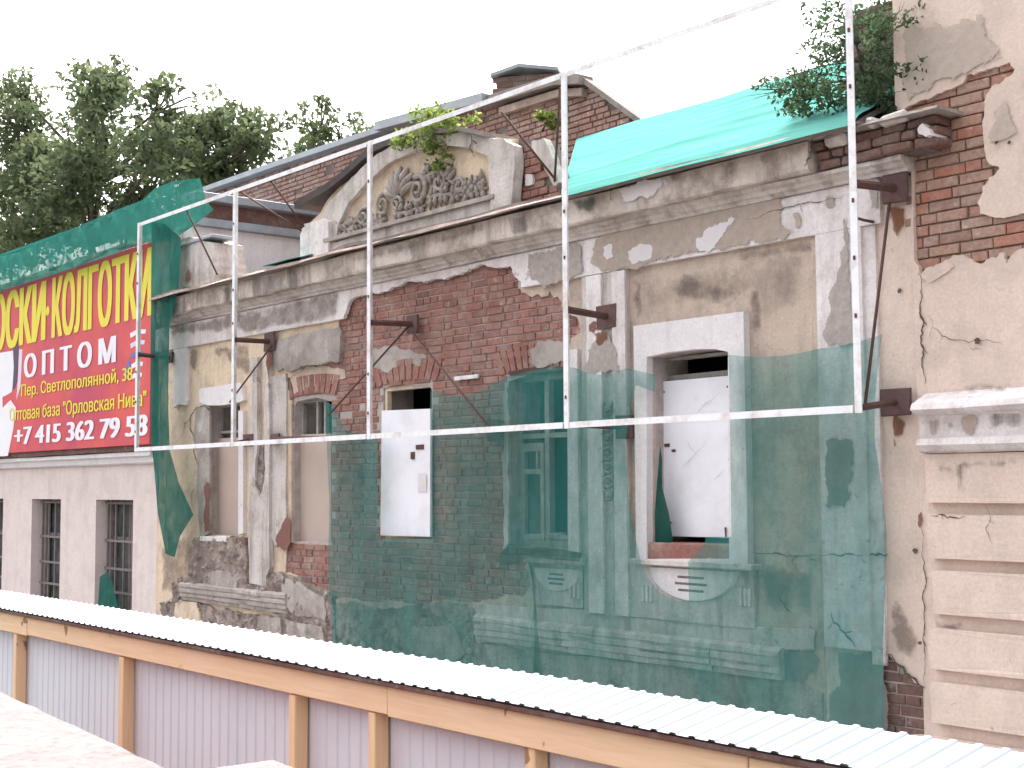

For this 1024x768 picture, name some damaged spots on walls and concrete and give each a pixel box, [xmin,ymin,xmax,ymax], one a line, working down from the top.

flaking render [807,64,1024,283]
peeling [822,219,853,346]
crack [919,274,1000,382]
flaking render [159,198,801,664]
flaking render [830,652,924,735]
crack [887,512,992,696]